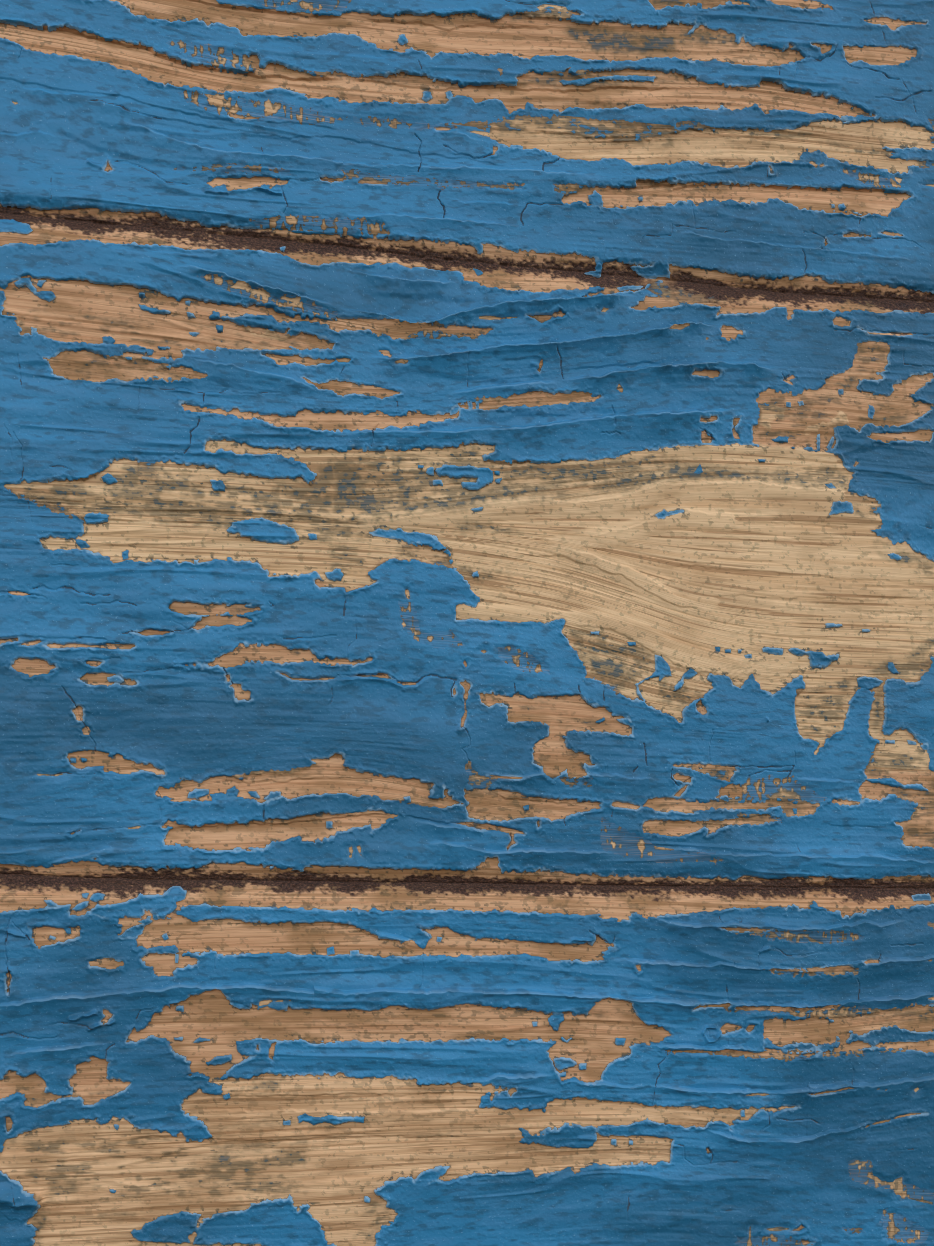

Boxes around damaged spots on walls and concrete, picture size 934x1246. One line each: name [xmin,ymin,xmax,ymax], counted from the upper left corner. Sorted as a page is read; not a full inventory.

peeling [0,203,239,250]
peeling [0,0,934,237]
peeling [0,214,934,977]
peeling [0,989,934,1246]